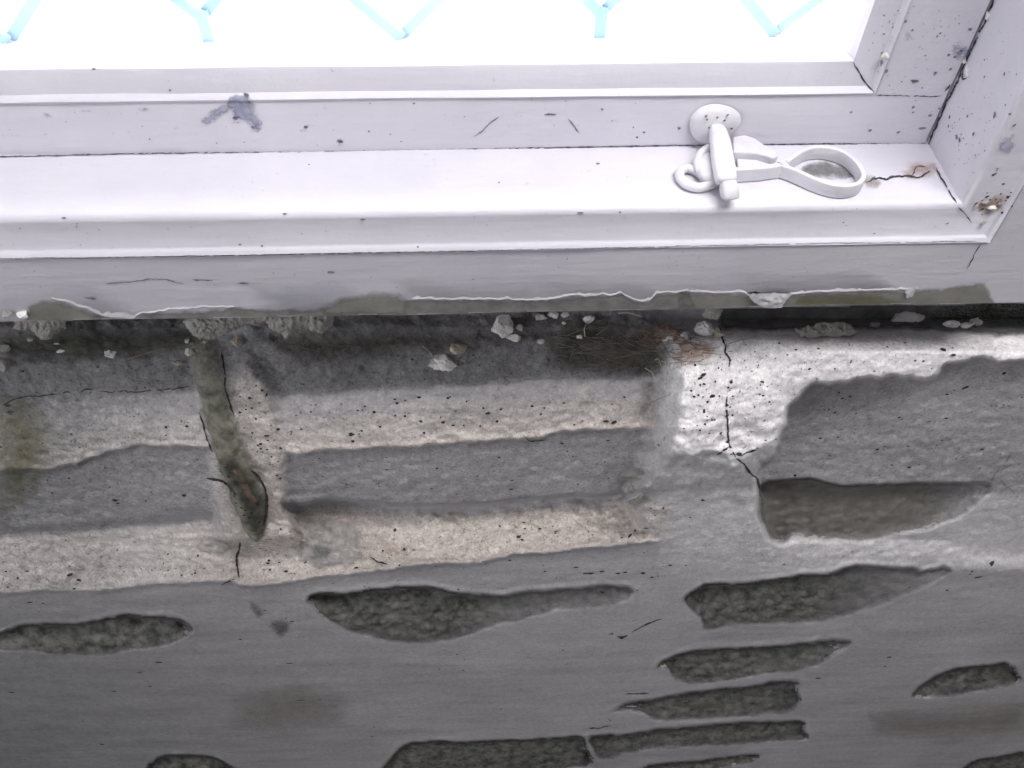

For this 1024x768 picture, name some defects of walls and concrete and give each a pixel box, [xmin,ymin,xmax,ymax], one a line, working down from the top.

crack [0,150,260,158]
crack [84,0,994,300]
crack [0,254,81,262]
peeling [52,284,993,320]
crack [719,326,731,366]
crack [717,397,760,489]
spalling [759,479,955,540]
spalling [0,614,193,655]
spalling [307,586,633,642]
spalling [684,567,894,629]
spalling [384,641,851,768]
spalling [912,663,1021,697]